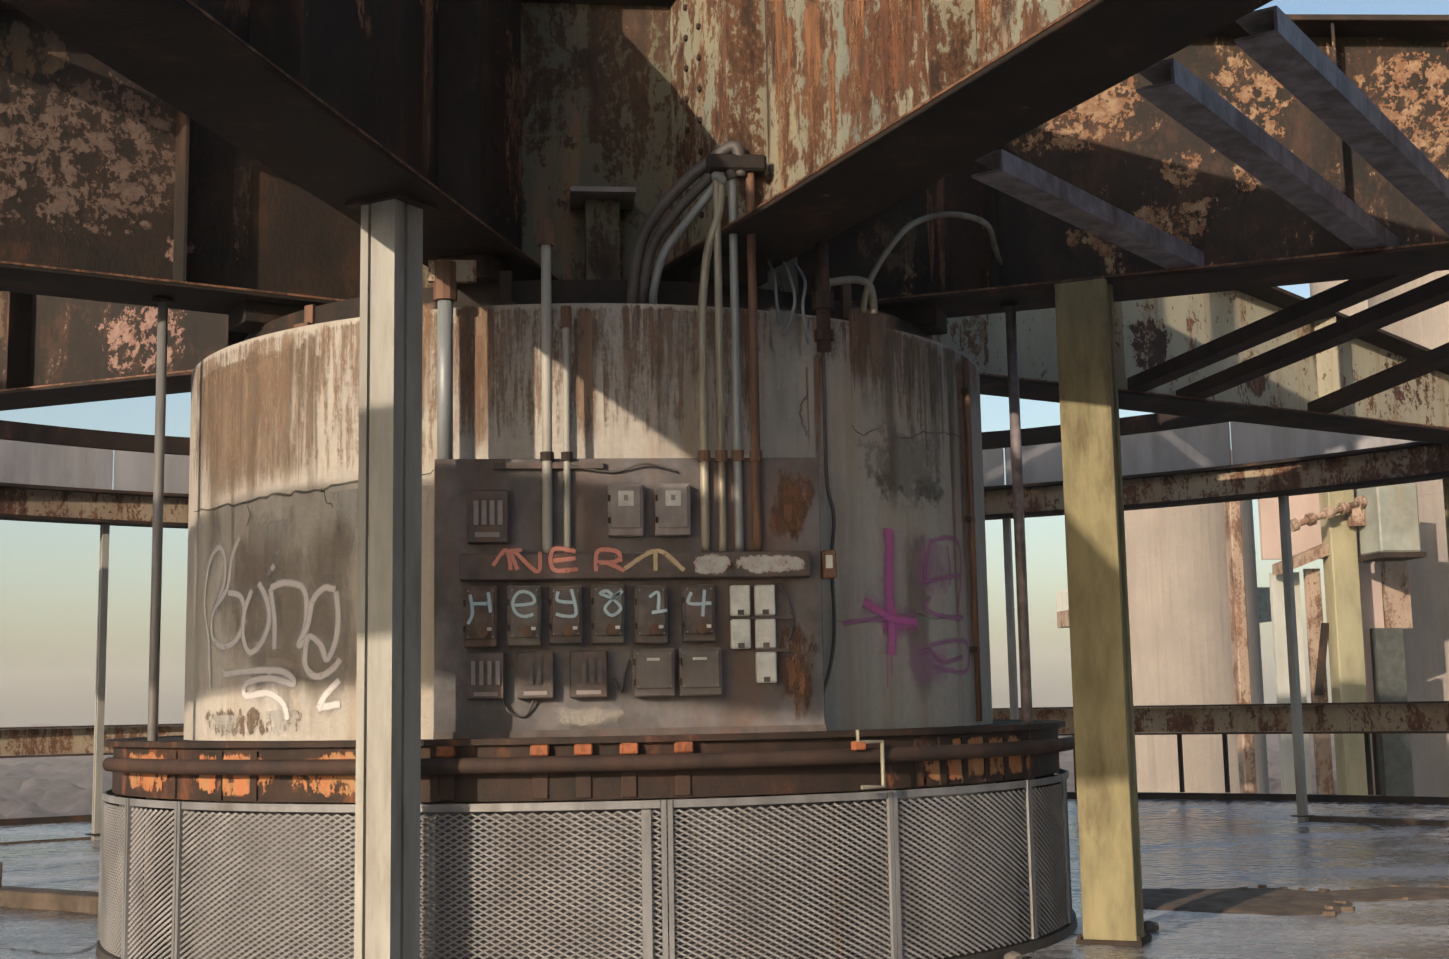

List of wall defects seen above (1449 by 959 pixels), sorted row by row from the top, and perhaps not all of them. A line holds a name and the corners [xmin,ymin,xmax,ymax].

corrosion [423,0,433,175]
corrosion [764,0,929,153]
corrosion [975,0,1011,50]
leakage [202,338,318,522]
leakage [574,311,597,432]
leakage [886,335,954,488]
crack [194,480,358,524]
corrosion [769,473,815,540]
corrosion [191,751,356,798]
corrosion [923,735,1030,781]